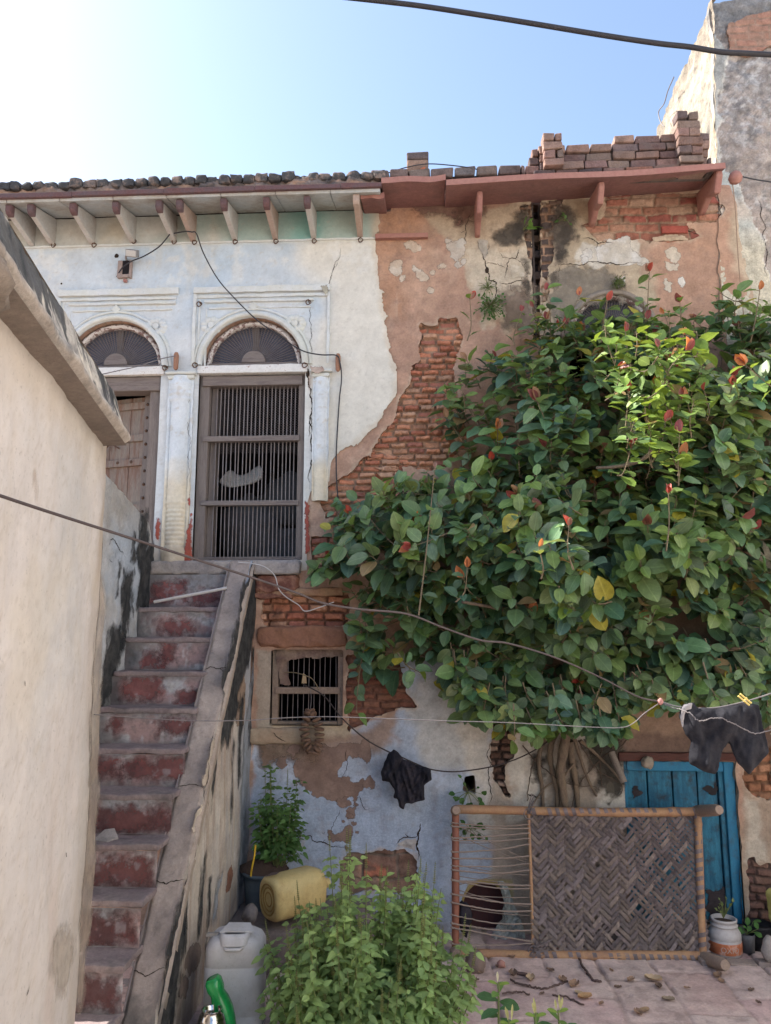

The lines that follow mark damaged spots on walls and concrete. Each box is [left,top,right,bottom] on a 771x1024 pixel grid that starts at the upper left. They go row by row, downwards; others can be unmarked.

peeling [388,238,467,294]
crack [463,211,528,302]
water stain [493,211,530,246]
spalling [580,193,722,293]
spalling [304,318,467,570]
water stain [77,509,154,1007]
peeling [276,654,418,894]
spalling [489,723,514,796]
spalling [742,746,771,800]
crack [395,824,421,859]
spalling [744,857,771,922]